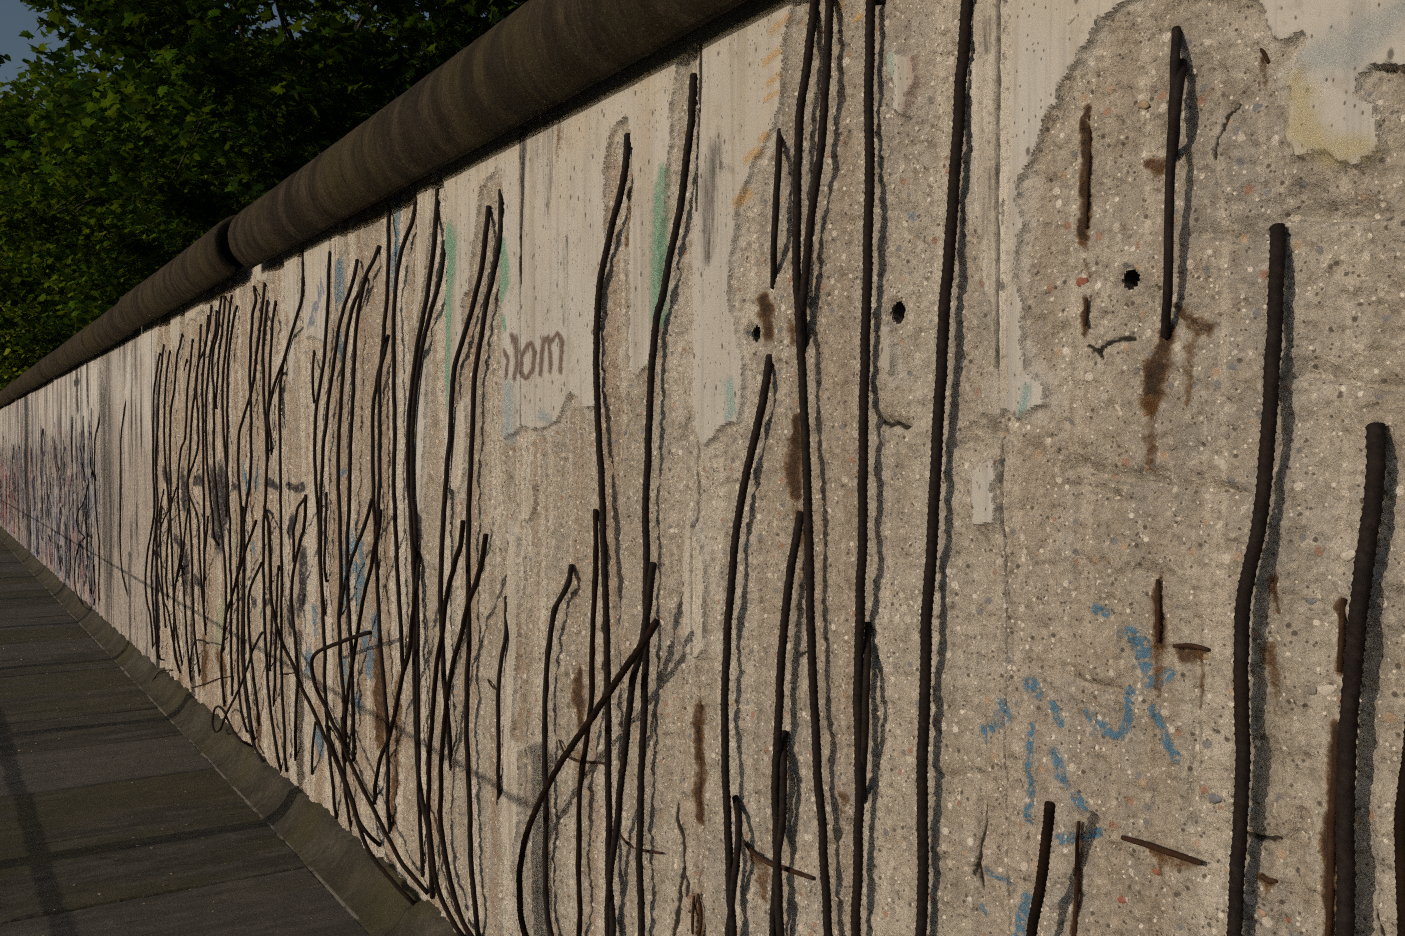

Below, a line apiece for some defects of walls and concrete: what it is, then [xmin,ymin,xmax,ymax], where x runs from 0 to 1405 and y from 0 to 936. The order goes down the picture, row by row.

rust [1076,103,1092,247]
rust [1139,302,1214,469]
spalling [119,400,128,596]
spalling [144,241,305,778]
spalling [290,494,308,677]
spalling [286,673,338,819]
spalling [314,650,328,706]
spalling [324,709,342,765]
rust [691,701,708,824]
rust [1151,576,1206,707]
rust [1318,719,1339,936]